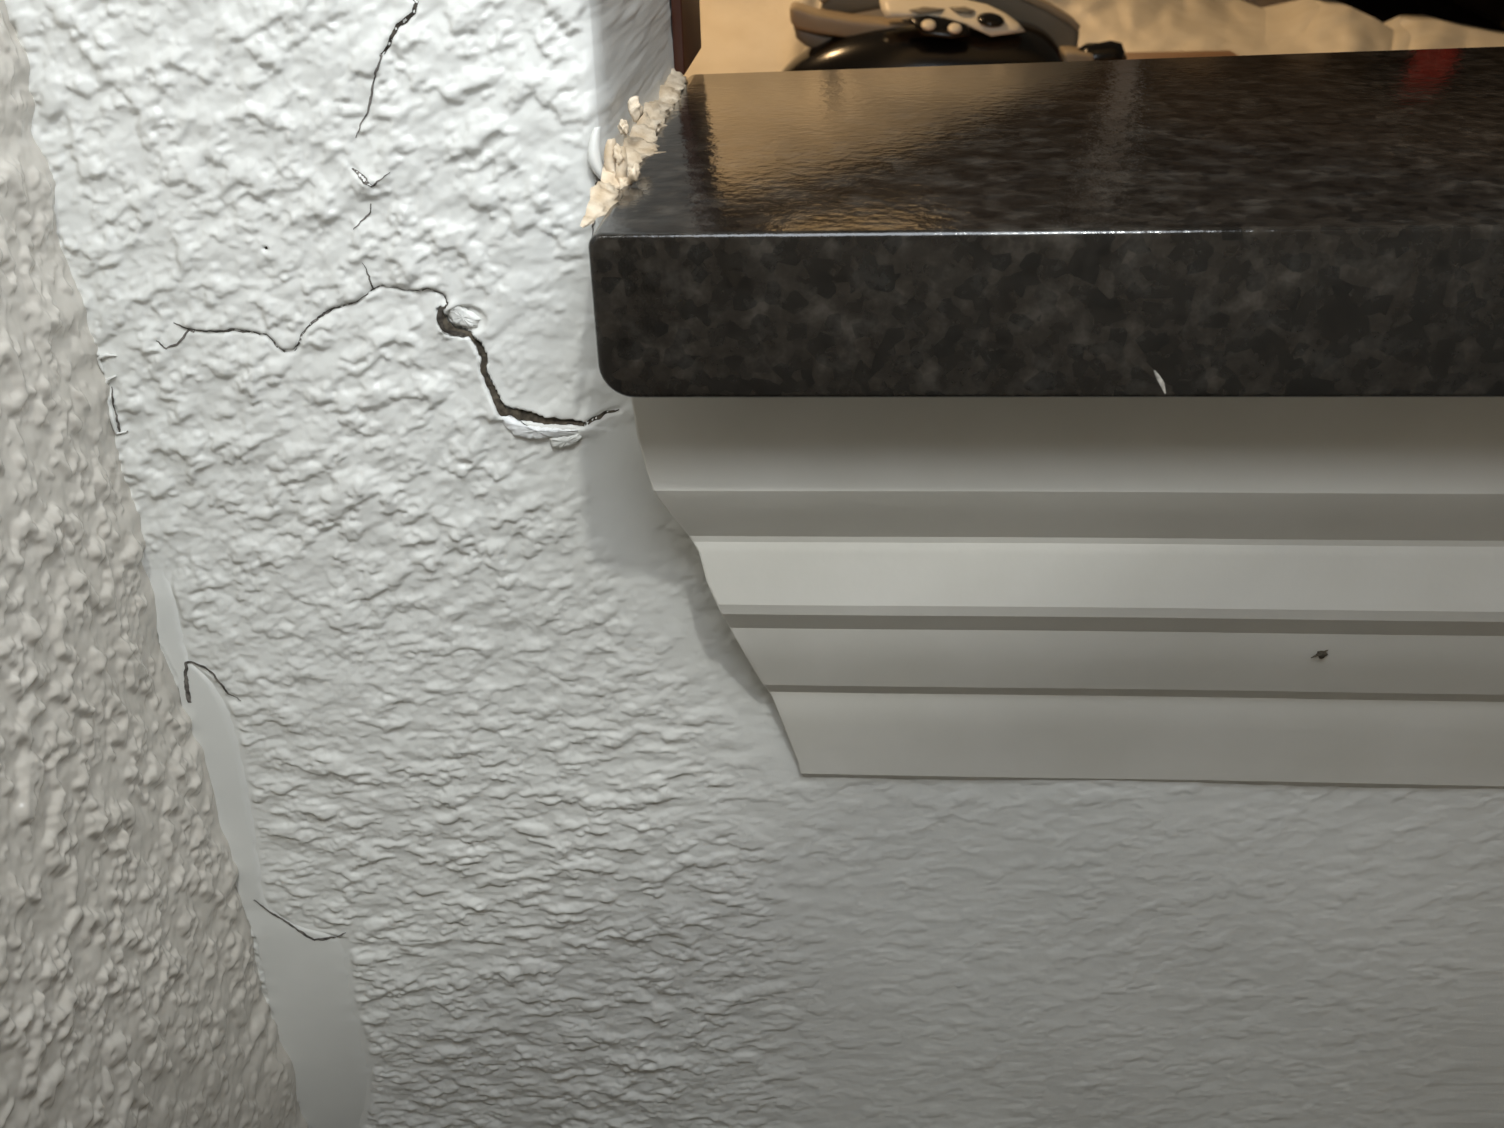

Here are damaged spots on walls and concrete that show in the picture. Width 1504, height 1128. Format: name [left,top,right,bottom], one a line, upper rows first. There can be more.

crack [156,0,619,448]
spalling [580,69,687,228]
peeling [146,569,269,919]